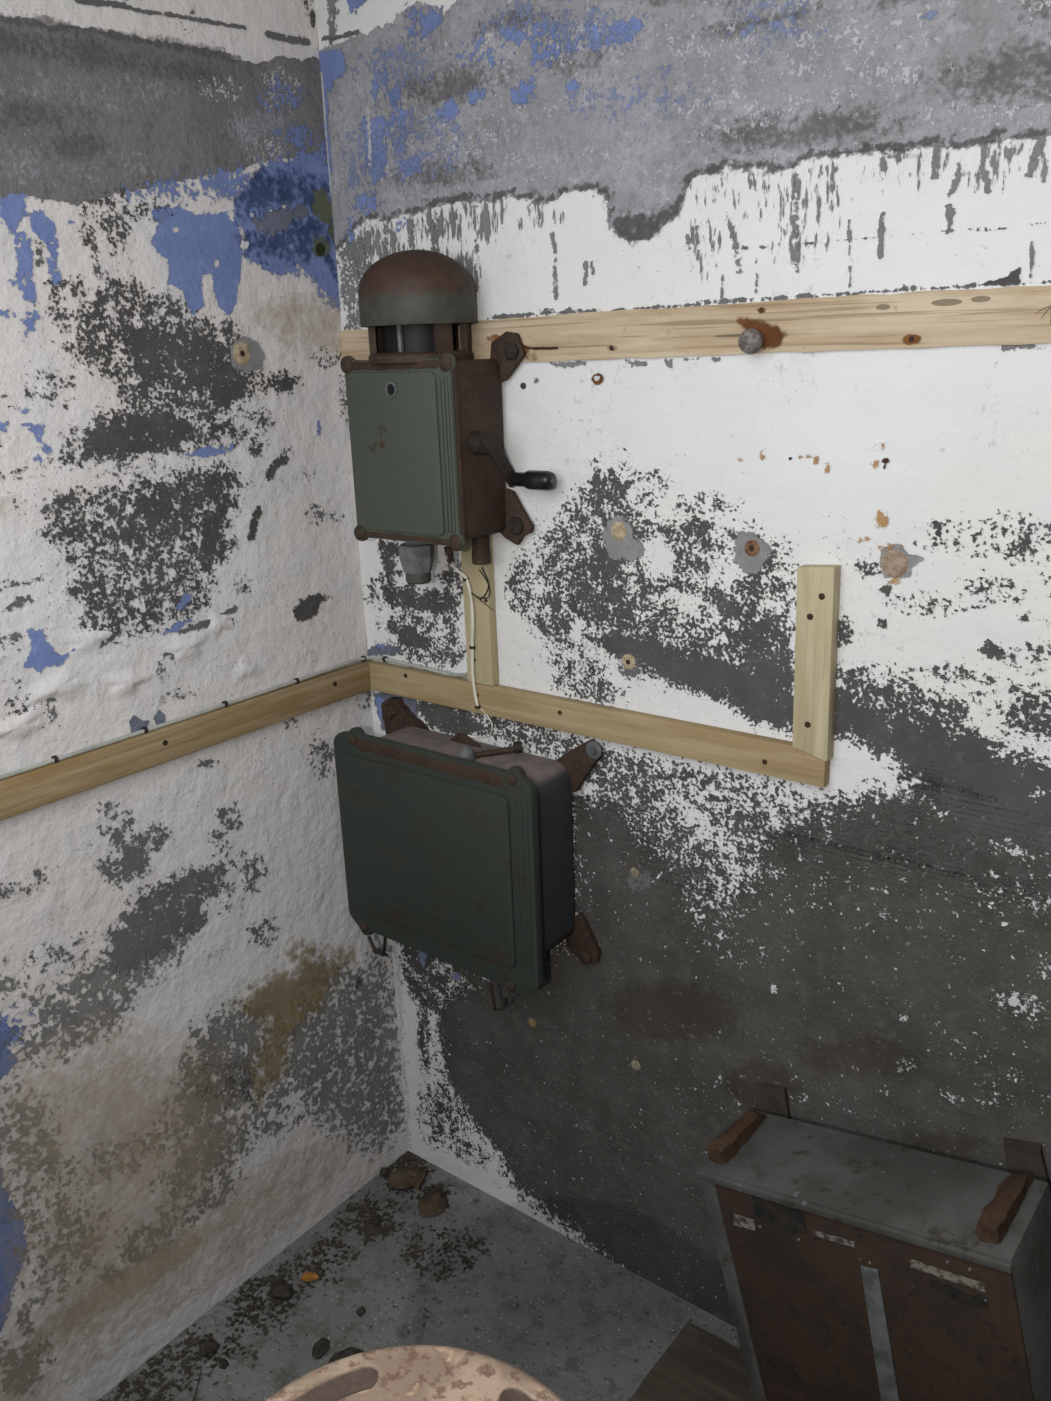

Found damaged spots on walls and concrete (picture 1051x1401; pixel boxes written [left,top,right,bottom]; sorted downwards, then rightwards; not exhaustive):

damp [550,231,558,300]
damp [583,261,594,286]
damp [720,216,758,301]
damp [791,174,801,273]
damp [877,212,885,259]
damp [930,143,992,234]
damp [1024,135,1046,177]
flaking render [0,0,1051,737]
rust [737,309,784,349]
rust [858,510,902,551]
damp [244,945,355,1108]
peeling [0,615,1051,1399]